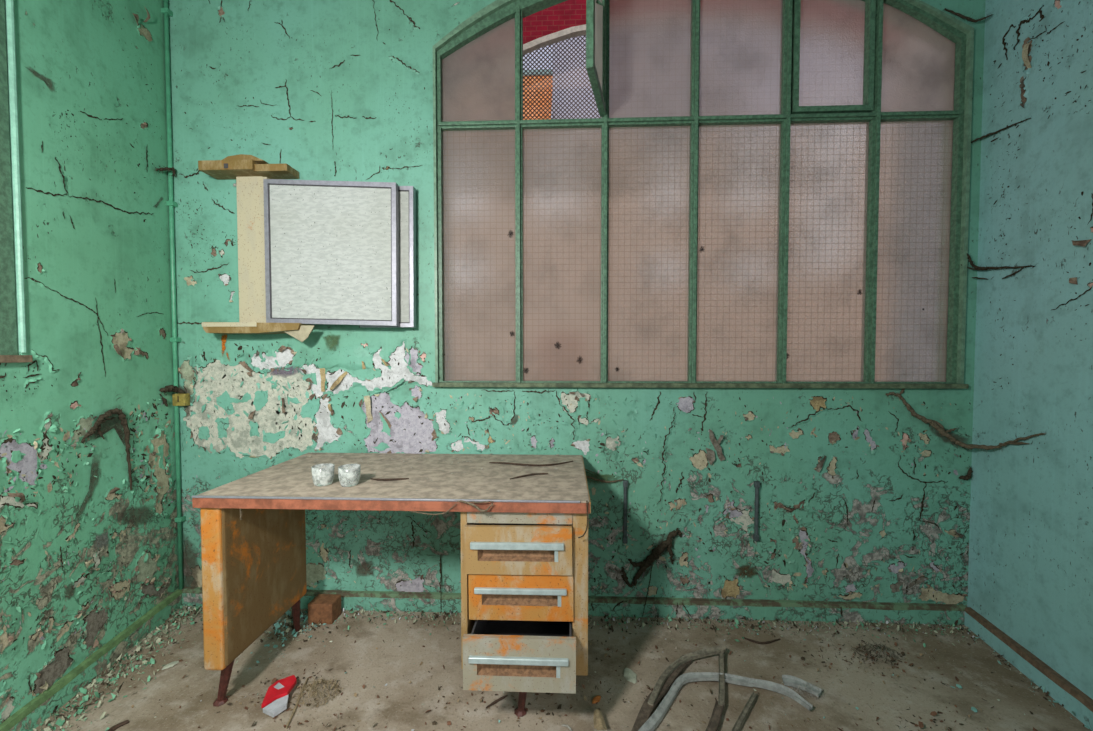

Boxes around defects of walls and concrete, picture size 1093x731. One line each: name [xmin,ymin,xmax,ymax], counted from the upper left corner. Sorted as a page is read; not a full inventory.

crack [239,0,420,177]
peeling [990,0,1092,159]
crack [26,141,153,229]
crack [179,170,235,214]
crack [24,277,116,377]
crack [138,312,202,325]
peeling [0,339,970,731]
peeling [588,613,1090,729]